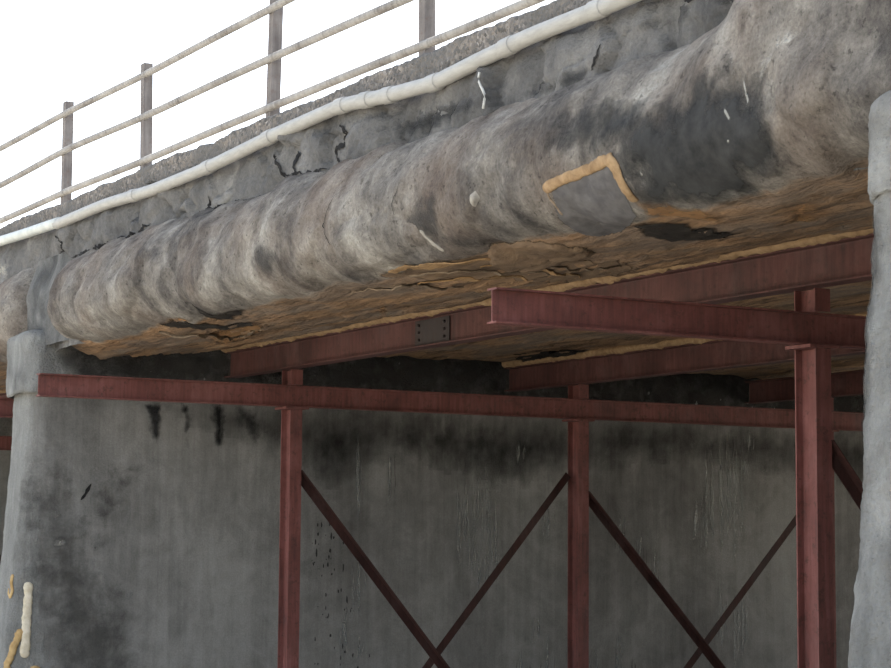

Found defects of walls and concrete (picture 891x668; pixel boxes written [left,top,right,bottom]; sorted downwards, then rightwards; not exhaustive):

crack [273,125,348,177]
leakage [569,75,777,205]
spalling [634,205,740,242]
peeling [352,240,639,294]
spalling [159,305,266,344]
spalling [513,349,585,362]
leakage [146,405,160,438]
crack [3,574,41,668]